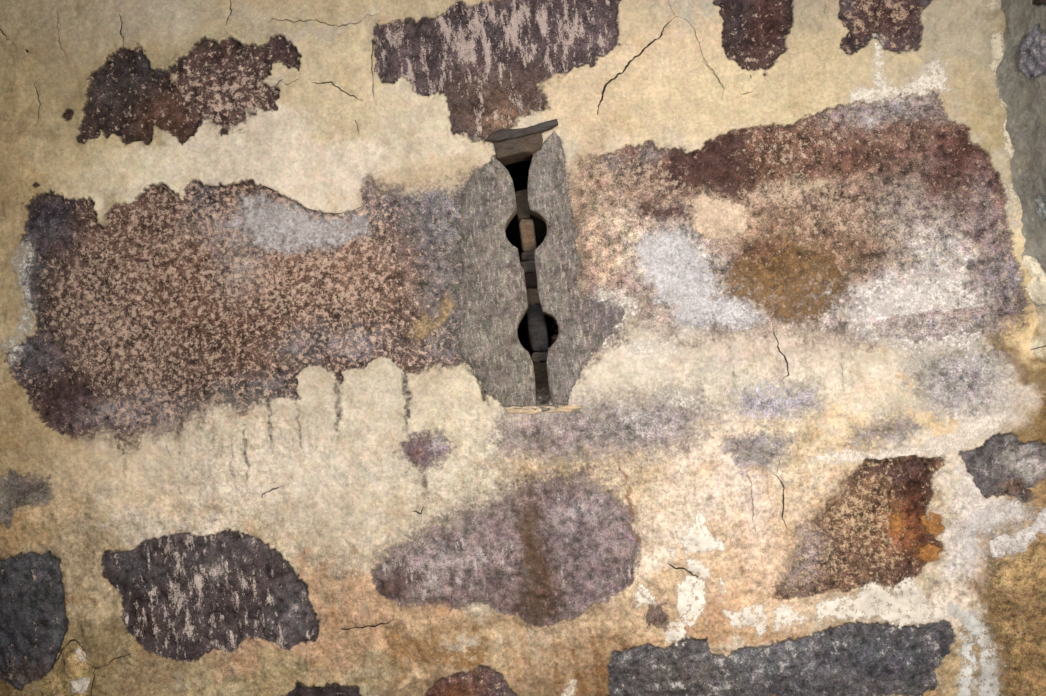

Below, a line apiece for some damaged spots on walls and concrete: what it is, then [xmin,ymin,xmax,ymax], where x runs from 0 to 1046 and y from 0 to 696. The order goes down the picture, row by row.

flaking render [62,34,302,145]
crack [269,14,377,132]
flaking render [372,0,621,143]
crack [597,8,752,115]
flaking render [568,0,1046,416]
flaking render [4,175,470,454]
flaking render [959,432,1046,503]
flaking render [0,551,68,691]
flaking render [101,530,319,662]
flaking render [371,381,1006,696]
corrosion [915,512,945,561]
flaking render [287,682,361,696]